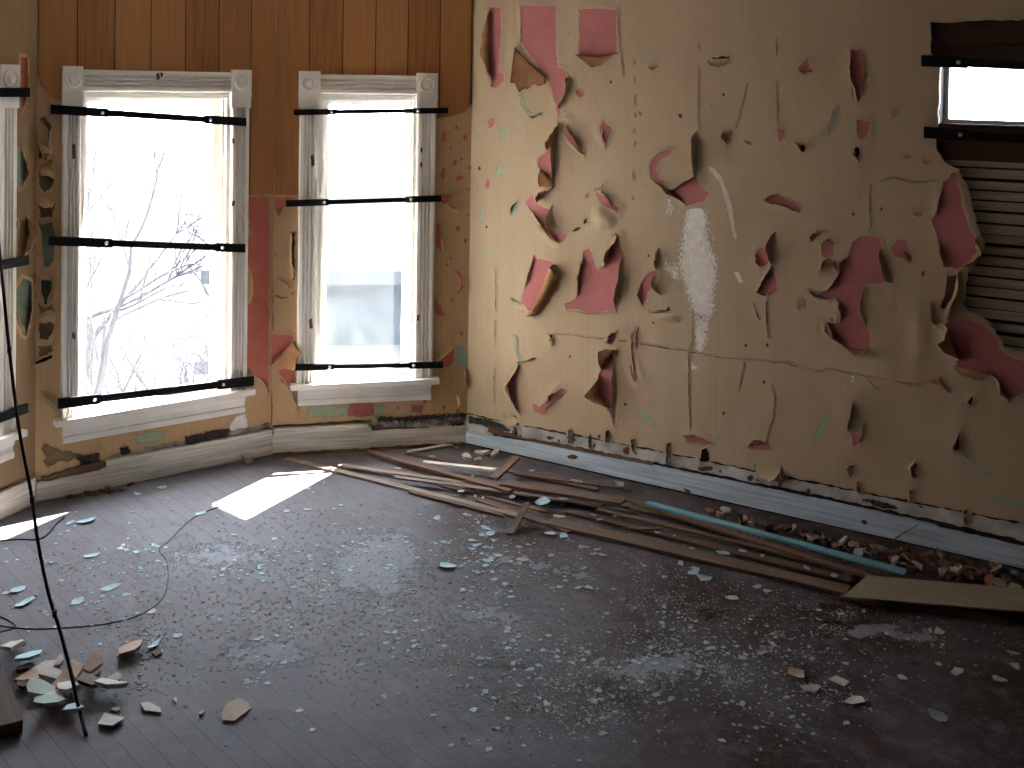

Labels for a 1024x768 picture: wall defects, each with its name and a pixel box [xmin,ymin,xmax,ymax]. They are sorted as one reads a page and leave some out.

leakage [663,198,722,376]
spalling [42,441,186,481]
flaking render [228,400,1024,546]